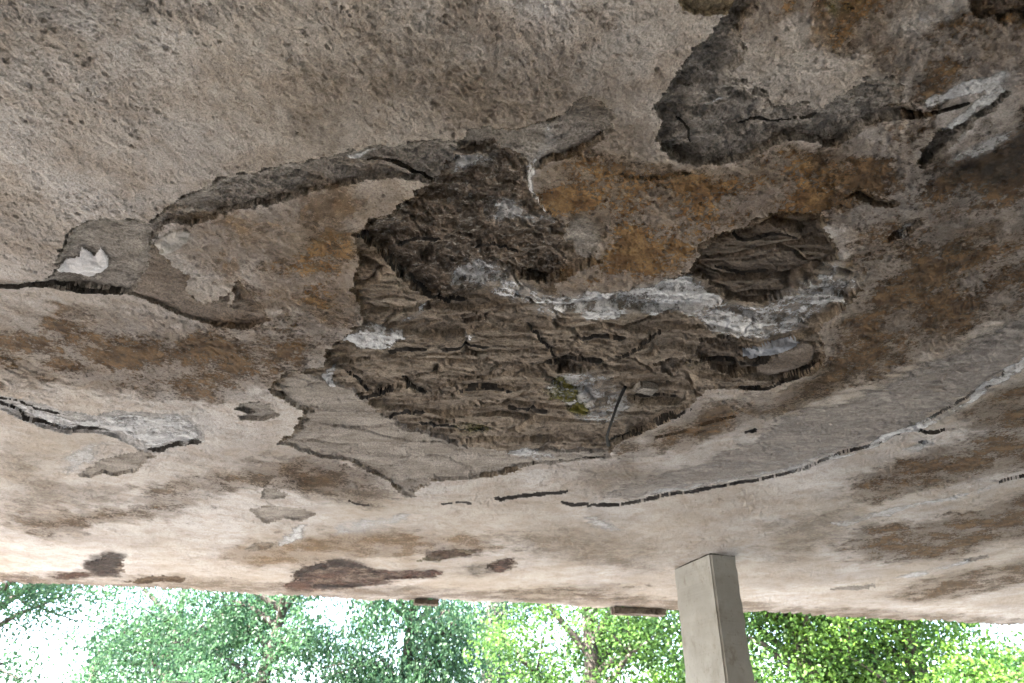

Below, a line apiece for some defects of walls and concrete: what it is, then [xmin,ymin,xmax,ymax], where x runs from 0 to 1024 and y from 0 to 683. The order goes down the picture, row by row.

spalling [968,0,1024,25]
spalling [652,0,928,168]
spalling [916,90,1012,169]
water stain [454,0,1024,460]
crack [0,279,123,295]
spalling [35,96,868,498]
peeling [0,395,205,478]
crack [441,361,1020,507]
crack [999,474,1024,484]